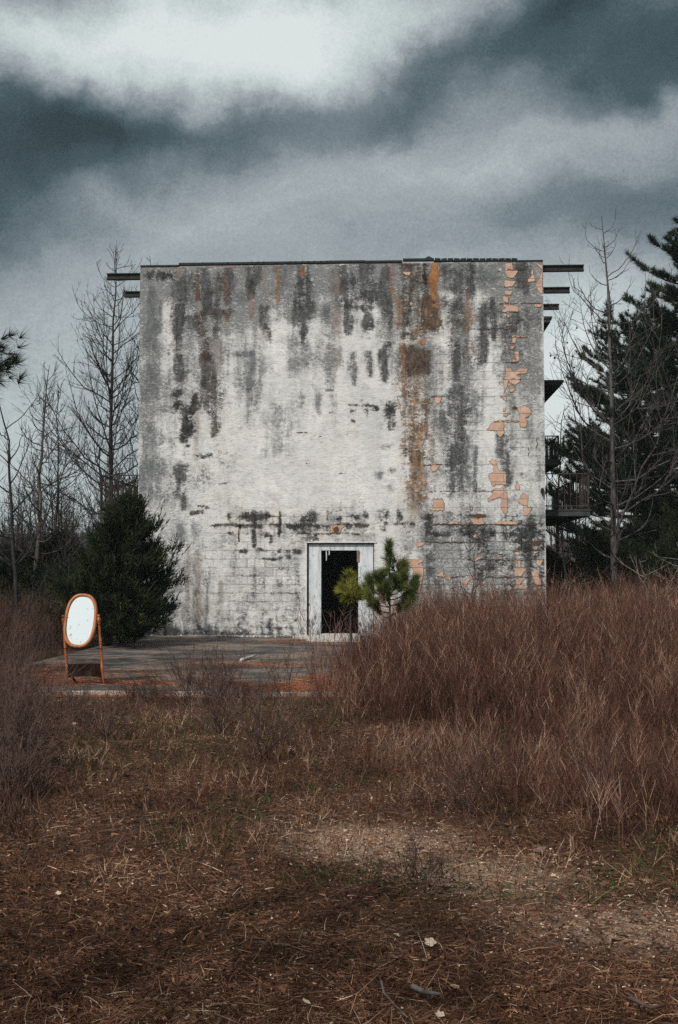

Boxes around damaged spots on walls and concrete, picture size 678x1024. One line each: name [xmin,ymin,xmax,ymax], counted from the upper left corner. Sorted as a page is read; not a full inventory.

water stain [139,266,272,537]
water stain [275,262,541,495]
corrosion [401,345,432,507]
corrosion [413,263,439,345]
peeling [487,262,543,437]
water stain [209,506,545,601]
peeling [407,542,425,593]
peeling [437,542,543,599]